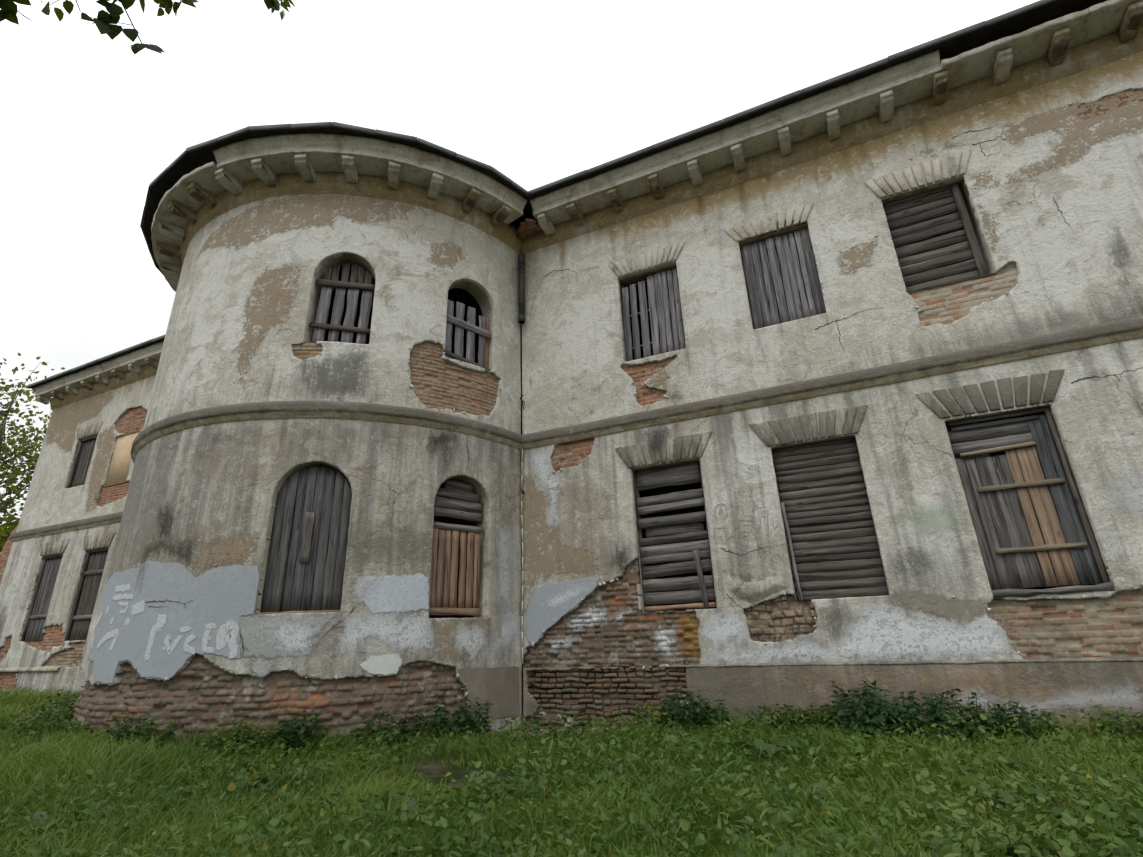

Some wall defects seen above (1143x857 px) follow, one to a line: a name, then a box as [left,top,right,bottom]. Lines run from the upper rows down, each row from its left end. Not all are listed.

crack [953,123,1005,156]
peeling [909,90,1143,326]
spalling [408,342,501,416]
spalling [621,357,676,405]
crack [1072,368,1139,383]
peeling [46,392,114,453]
peeling [83,406,147,515]
spalling [551,438,595,473]
peeling [521,475,598,596]
spalling [0,559,716,744]
spalling [744,592,817,645]
spalling [892,582,1143,658]